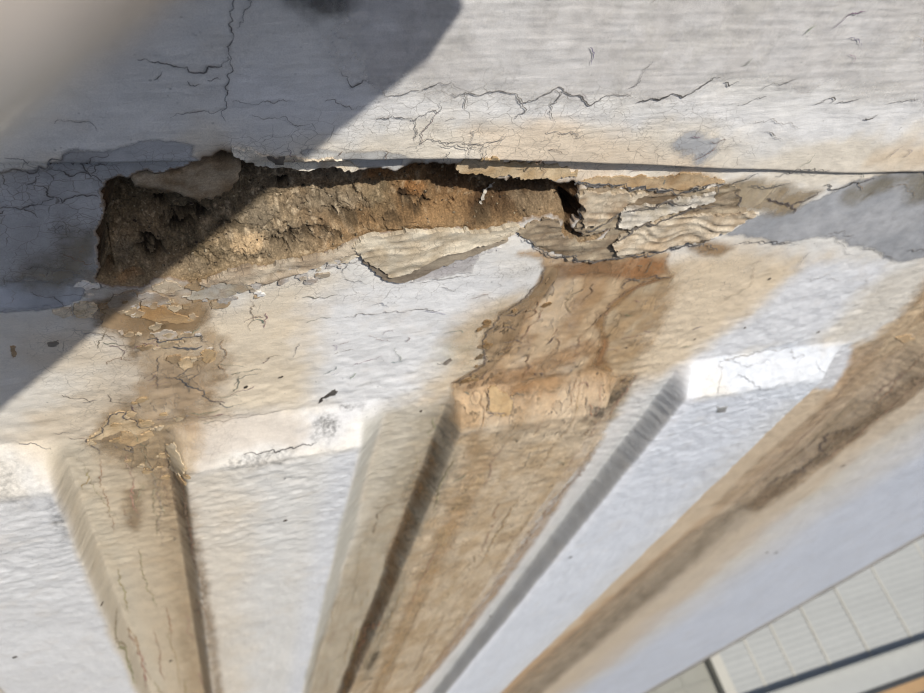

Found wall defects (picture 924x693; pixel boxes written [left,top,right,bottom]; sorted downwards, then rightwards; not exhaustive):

crack [138,0,315,128]
crack [326,58,753,176]
crack [815,97,920,120]
crack [246,301,268,331]
spalling [0,132,924,370]
crack [302,136,924,417]
leakage [592,274,674,378]
peeling [87,397,191,486]
crack [19,327,298,649]
crack [244,442,317,455]
leakage [723,341,924,509]
leakage [513,515,726,693]